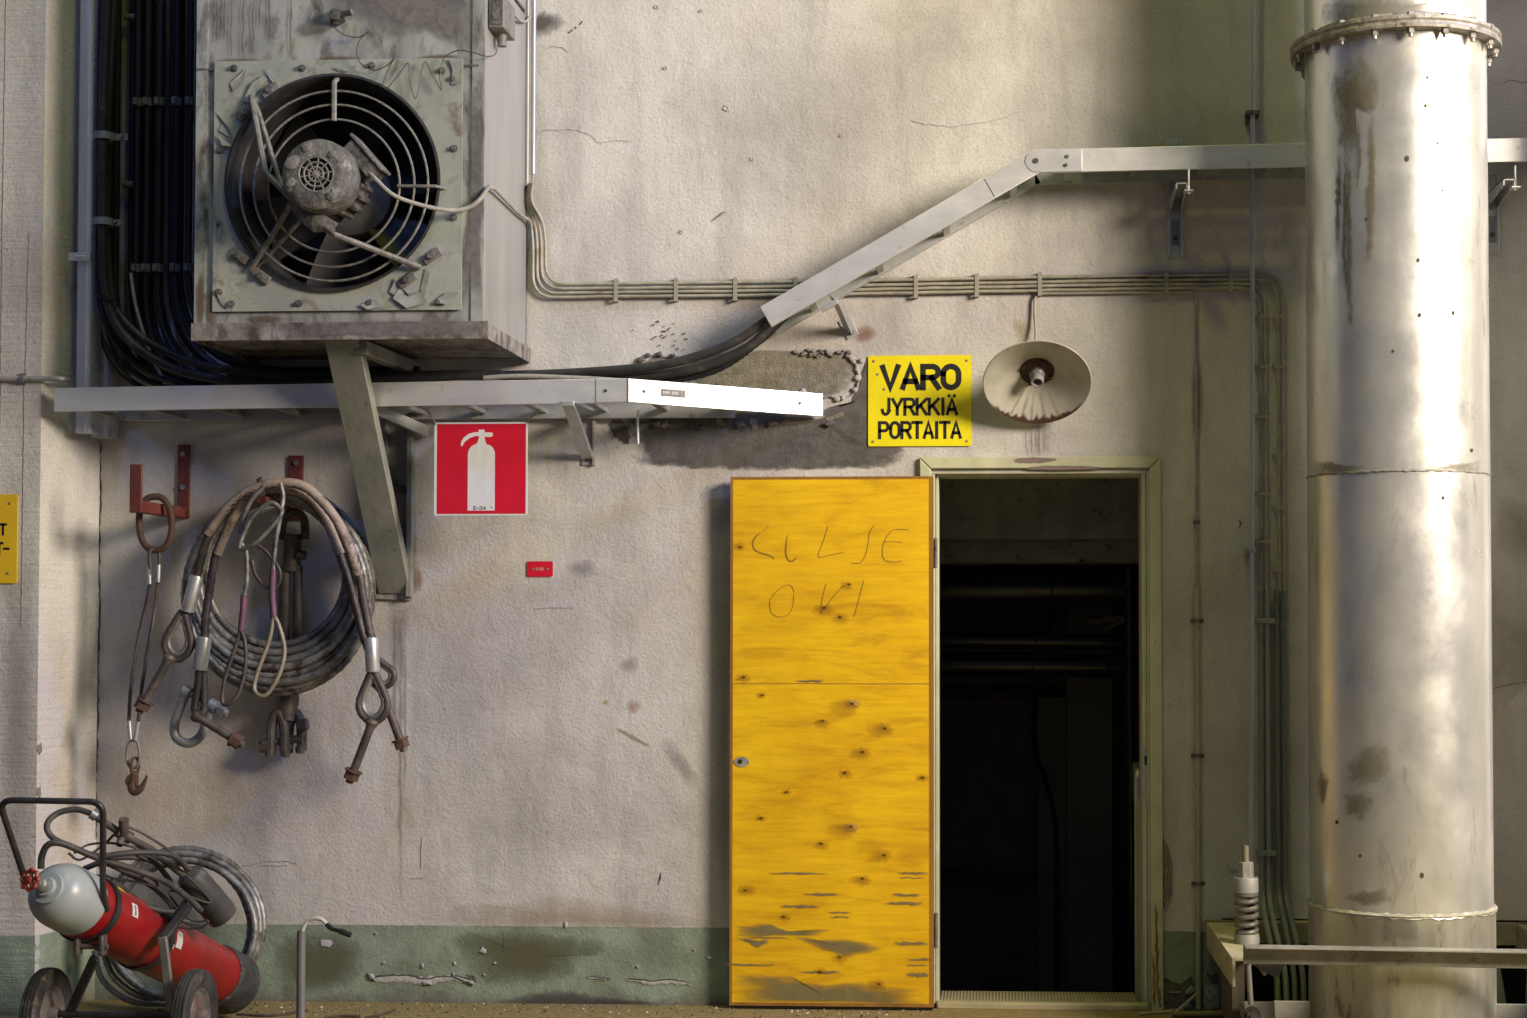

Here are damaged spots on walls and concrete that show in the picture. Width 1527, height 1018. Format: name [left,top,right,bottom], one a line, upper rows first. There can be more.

flaking render [636,348,865,402]